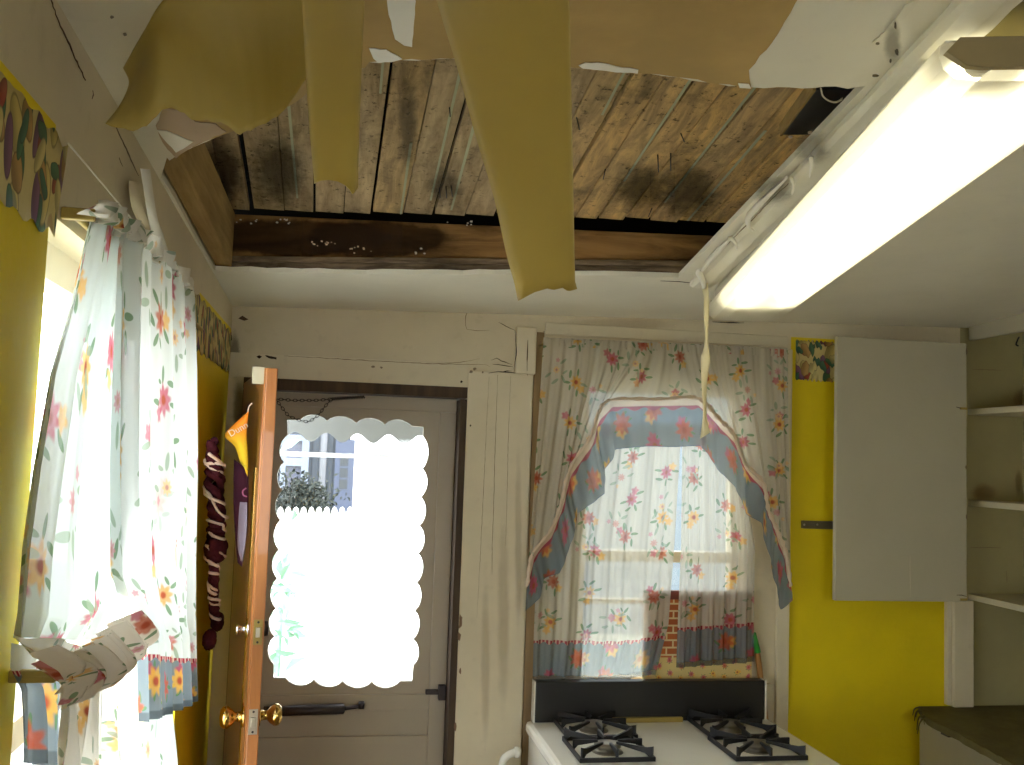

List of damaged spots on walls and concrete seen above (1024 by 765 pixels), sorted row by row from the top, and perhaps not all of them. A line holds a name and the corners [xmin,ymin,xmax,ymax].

crack [51,0,94,99]
peeling [105,0,307,158]
peeling [362,0,454,68]
peeling [569,0,797,87]
leakage [399,93,414,157]
peeling [129,168,168,265]
leakage [233,219,448,257]
spalling [231,246,510,270]
leakage [618,170,711,211]
peeling [745,176,789,232]